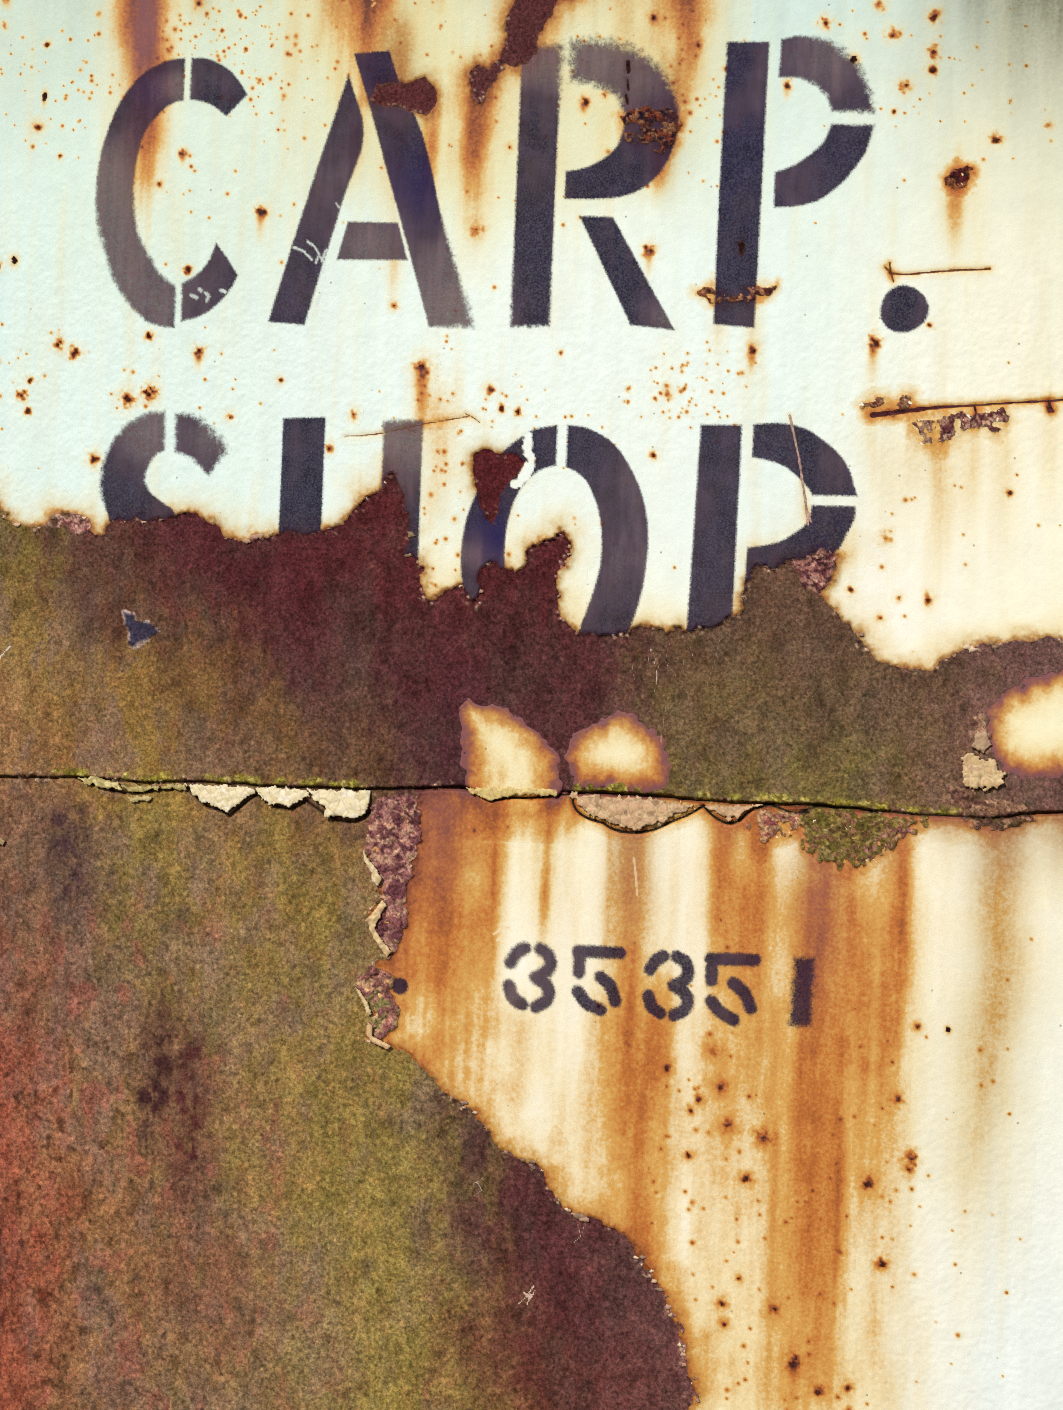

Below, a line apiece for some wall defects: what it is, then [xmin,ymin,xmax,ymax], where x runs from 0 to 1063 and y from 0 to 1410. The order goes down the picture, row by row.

corrosion [245,0,519,292]
corrosion [928,123,1013,262]
corrosion [178,260,198,280]
corrosion [379,241,410,318]
peeling [447,424,544,548]
peeling [78,776,371,818]
crack [0,767,1063,844]
peeling [466,786,763,831]
peeling [961,731,1007,792]
peeling [363,851,392,957]
corrosion [0,328,1063,1410]
peeling [355,987,391,1049]